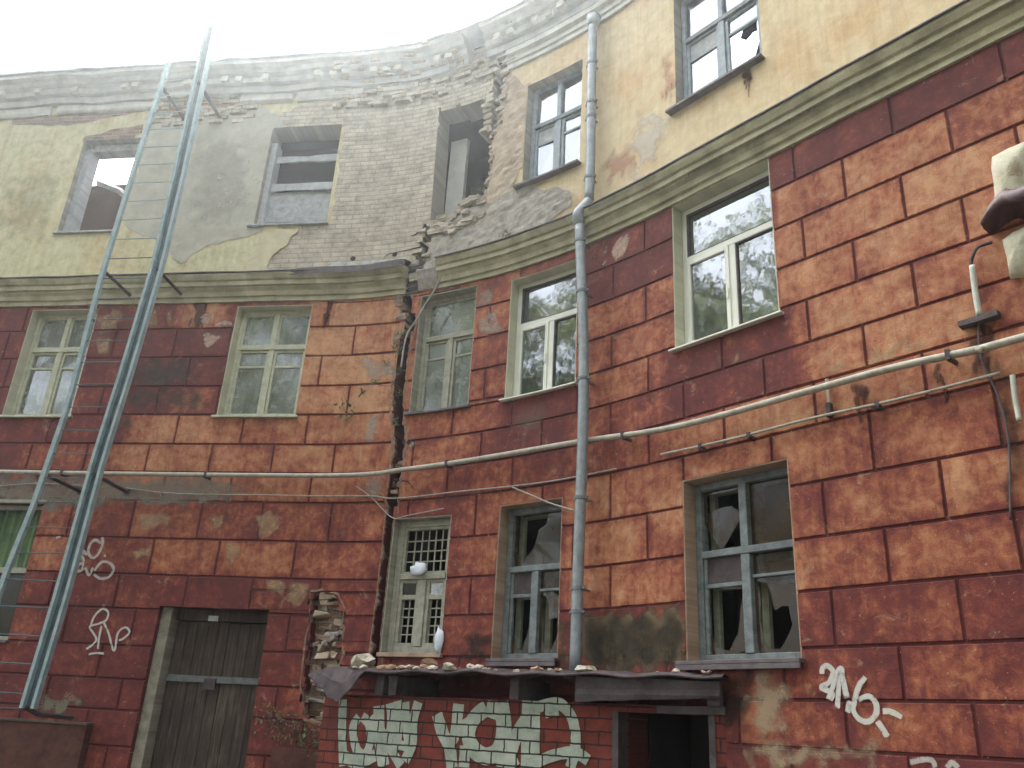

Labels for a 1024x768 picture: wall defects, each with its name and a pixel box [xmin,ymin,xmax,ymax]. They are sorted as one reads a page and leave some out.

peeling [11,103,187,240]
peeling [169,45,572,271]
crack [478,60,510,145]
rust [742,68,752,97]
crack [366,224,437,665]
spalling [268,581,346,726]
water stain [583,606,686,672]